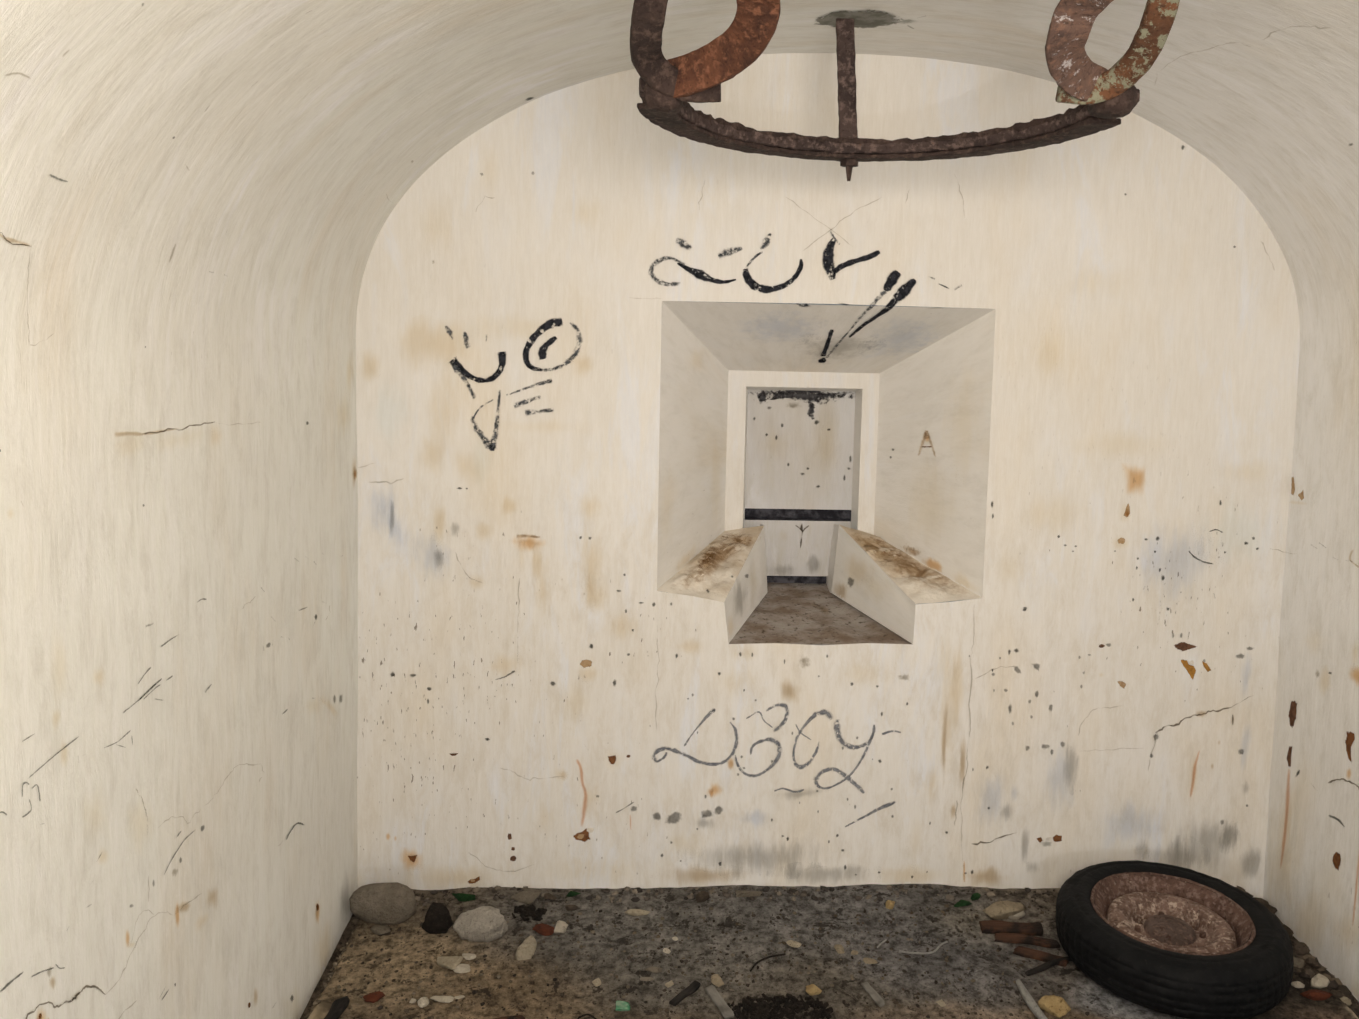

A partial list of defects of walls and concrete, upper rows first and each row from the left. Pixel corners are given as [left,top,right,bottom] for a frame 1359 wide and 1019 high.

corrosion [1345,732,1355,762]
crack [26,985,104,1019]